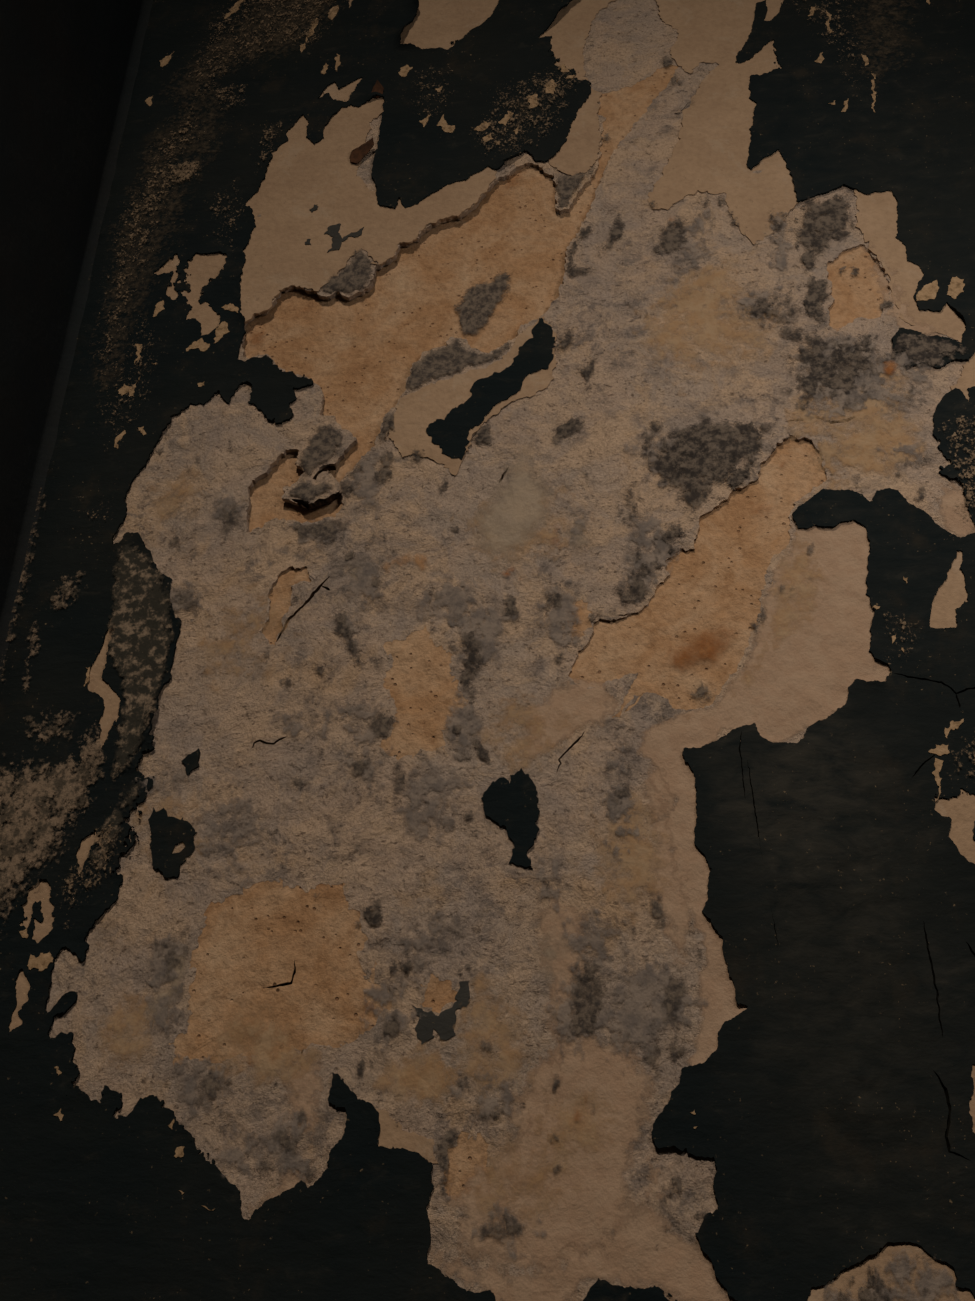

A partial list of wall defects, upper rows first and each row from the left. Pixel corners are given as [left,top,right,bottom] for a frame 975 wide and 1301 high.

peeling [400,0,499,50]
peeling [153,253,230,352]
spalling [238,65,677,483]
leakage [567,226,593,276]
leakage [598,214,625,255]
leakage [644,193,966,484]
leakage [289,414,395,518]
leakage [289,518,383,666]
leakage [317,408,776,844]
spalling [569,437,828,718]
peeling [928,719,975,864]
spalling [169,878,392,1065]